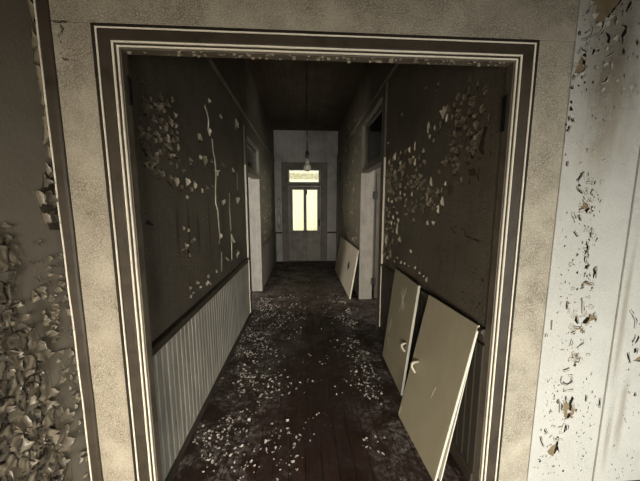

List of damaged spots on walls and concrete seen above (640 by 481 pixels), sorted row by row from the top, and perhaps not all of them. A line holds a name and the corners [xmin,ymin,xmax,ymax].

peeling [25,0,61,230]
peeling [137,93,240,299]
peeling [382,77,491,284]
peeling [570,46,594,94]
peeling [566,172,604,228]
flaking render [583,0,640,51]
peeling [0,221,88,481]
flaking render [534,273,598,469]
peeling [627,309,640,370]